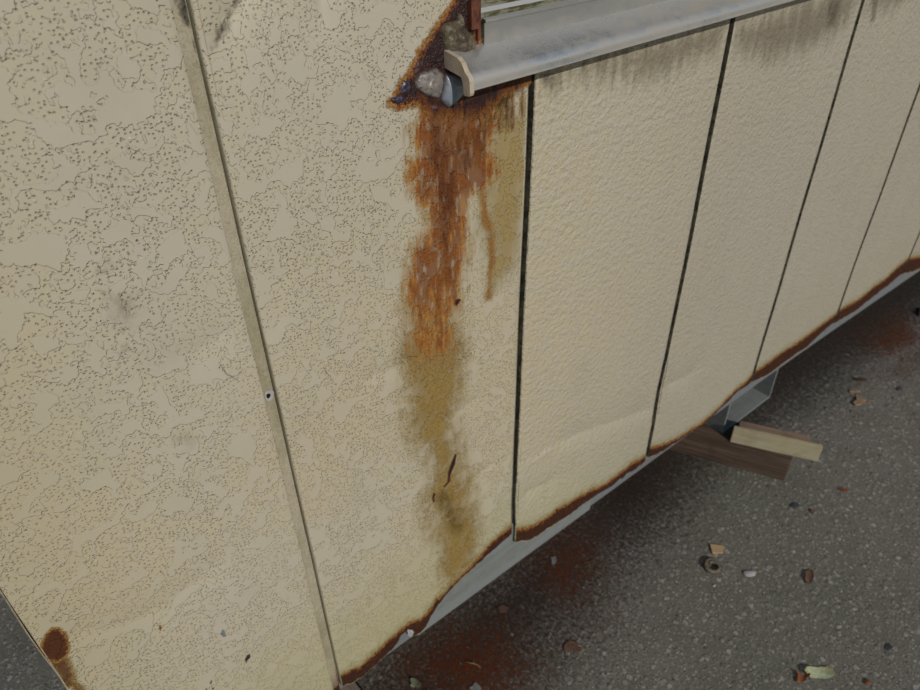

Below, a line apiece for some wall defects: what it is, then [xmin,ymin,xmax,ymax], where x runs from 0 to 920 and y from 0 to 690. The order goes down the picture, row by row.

rust [40,627,85,690]
rust [333,0,920,690]